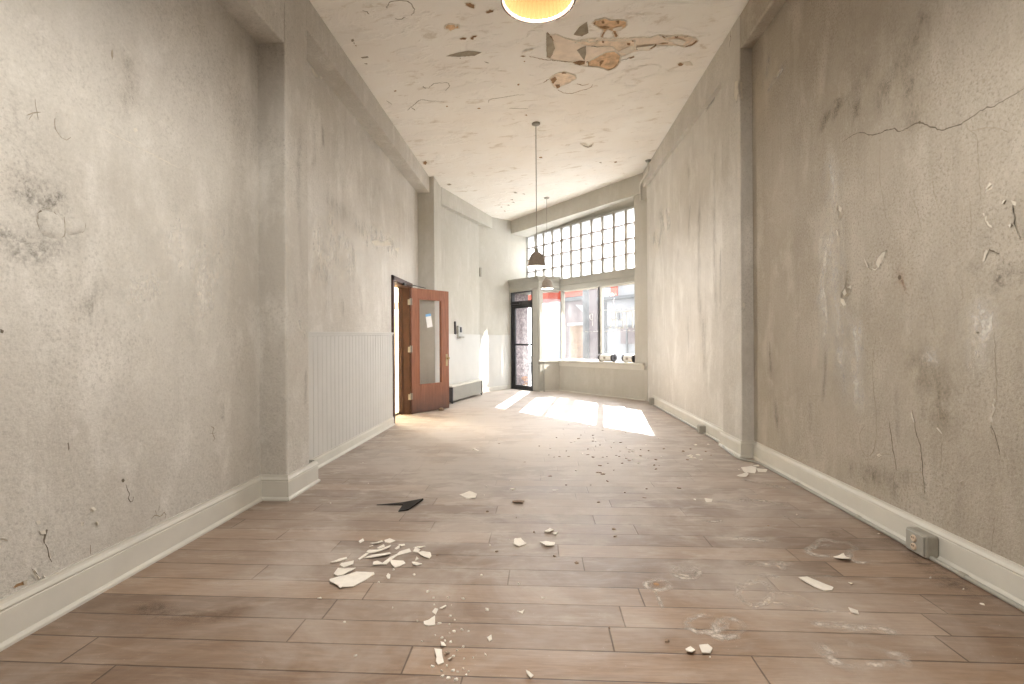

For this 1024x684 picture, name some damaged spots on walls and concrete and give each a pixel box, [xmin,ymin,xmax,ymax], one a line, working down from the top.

peeling [444,23,478,40]
peeling [521,17,699,94]
crack [846,88,1024,230]
crack [859,337,942,496]
crack [989,321,1001,456]